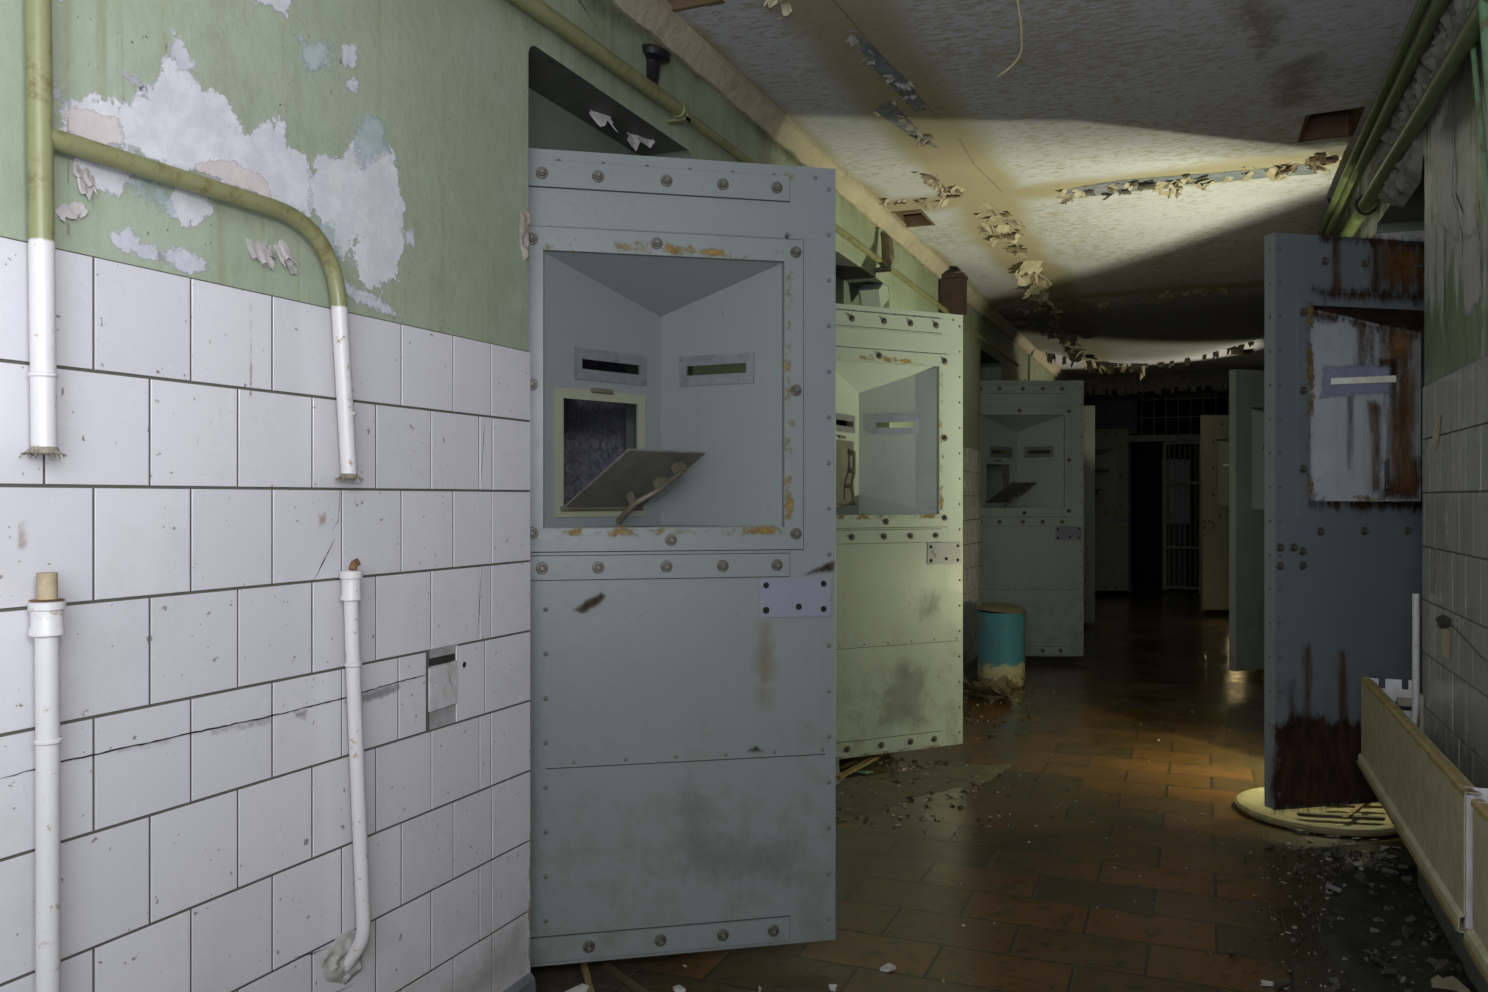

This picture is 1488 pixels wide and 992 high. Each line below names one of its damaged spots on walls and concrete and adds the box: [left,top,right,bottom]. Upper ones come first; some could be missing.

peeling [254,0,291,18]
peeling [764,0,792,20]
peeling [53,29,415,316]
peeling [876,171,966,211]
peeling [1060,153,1341,205]
peeling [975,204,1254,380]
rust [1307,231,1424,512]
rust [1270,647,1380,813]